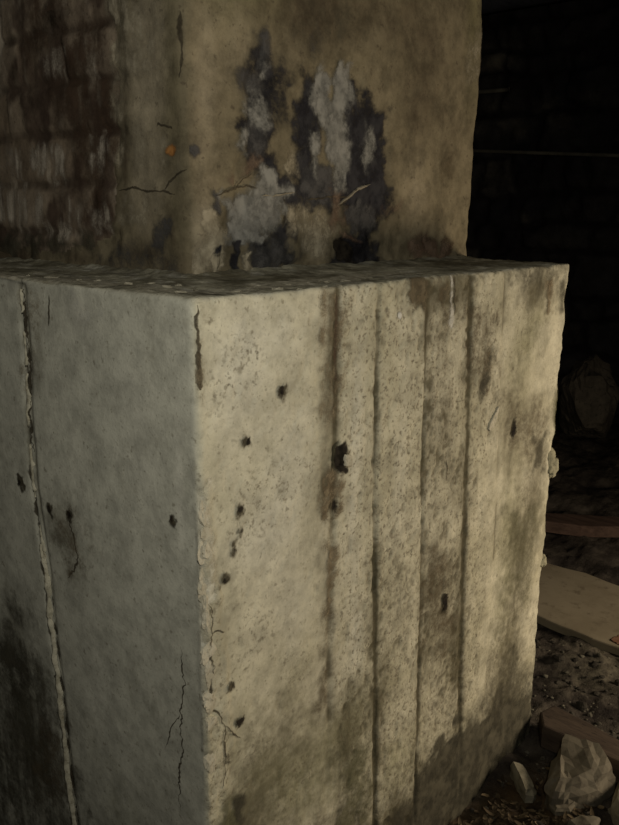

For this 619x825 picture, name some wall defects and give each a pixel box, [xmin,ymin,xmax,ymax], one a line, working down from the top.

crack [119,169,187,194]
crack [217,174,255,196]
peeling [237,97,272,151]
peeling [192,164,376,274]
peeling [309,61,355,194]
peeling [362,129,375,164]
water stain [0,623,79,825]
crack [166,604,240,811]
water stain [394,658,533,825]
water stain [222,794,246,825]